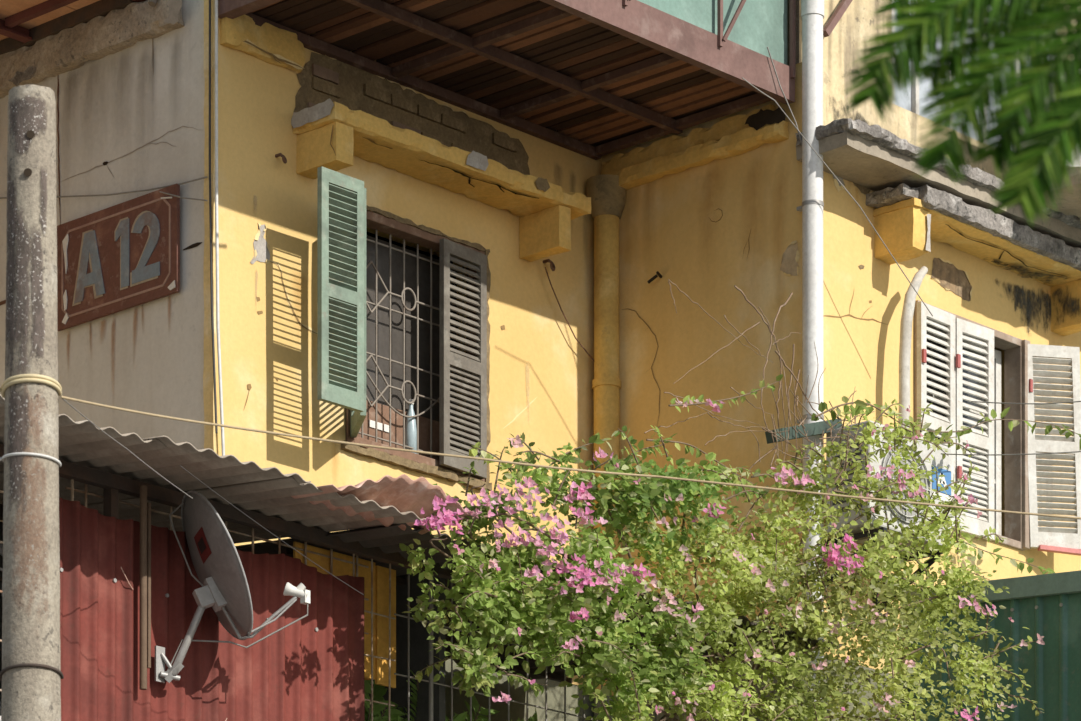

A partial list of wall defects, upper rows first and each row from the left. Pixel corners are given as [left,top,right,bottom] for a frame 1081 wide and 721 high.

crack [57,74,197,223]
flaking render [291,52,550,192]
crack [421,160,539,199]
spalling [250,223,270,264]
spalling [926,214,973,301]
leakage [993,260,1080,329]
crack [622,308,660,424]